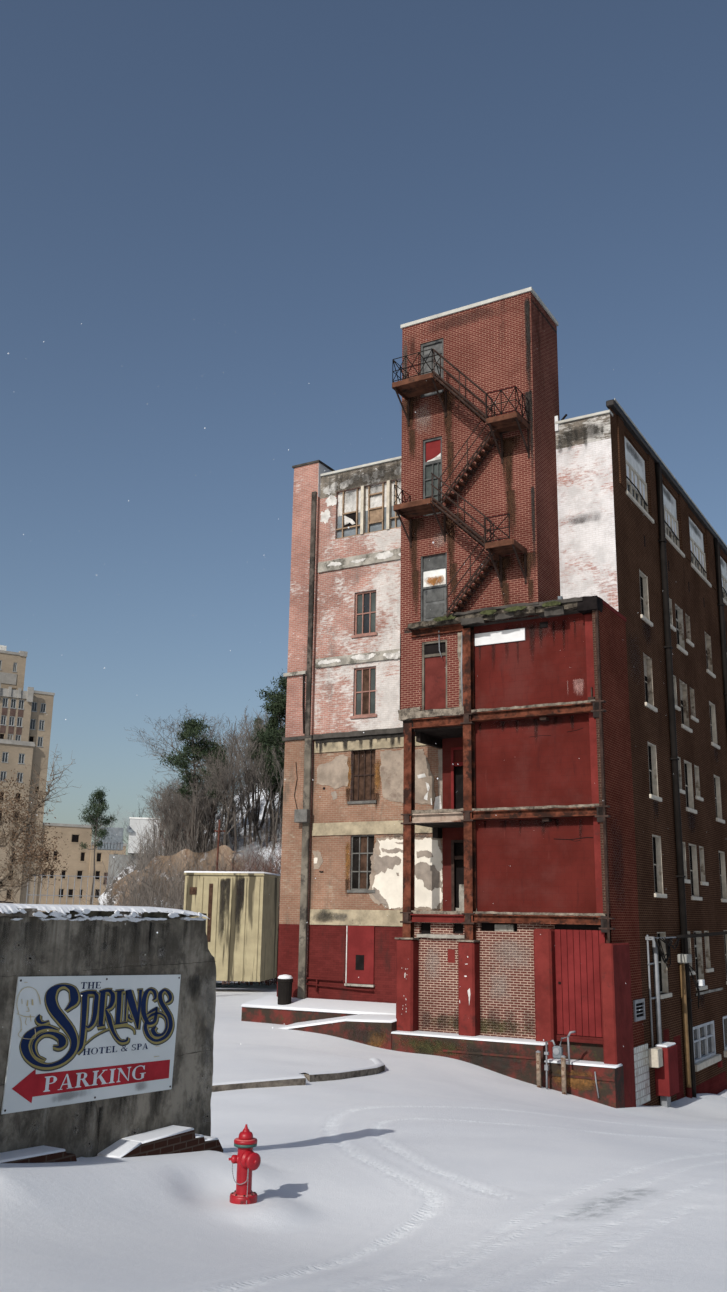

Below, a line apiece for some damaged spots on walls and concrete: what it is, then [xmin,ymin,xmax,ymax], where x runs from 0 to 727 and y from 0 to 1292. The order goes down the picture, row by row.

rust [403,396,420,455]
rust [440,391,454,478]
peeling [320,464,401,524]
rust [497,435,520,526]
peeling [328,551,401,566]
rust [405,513,461,602]
rust [495,552,536,605]
peeling [417,773,442,810]
flaking render [368,834,443,911]